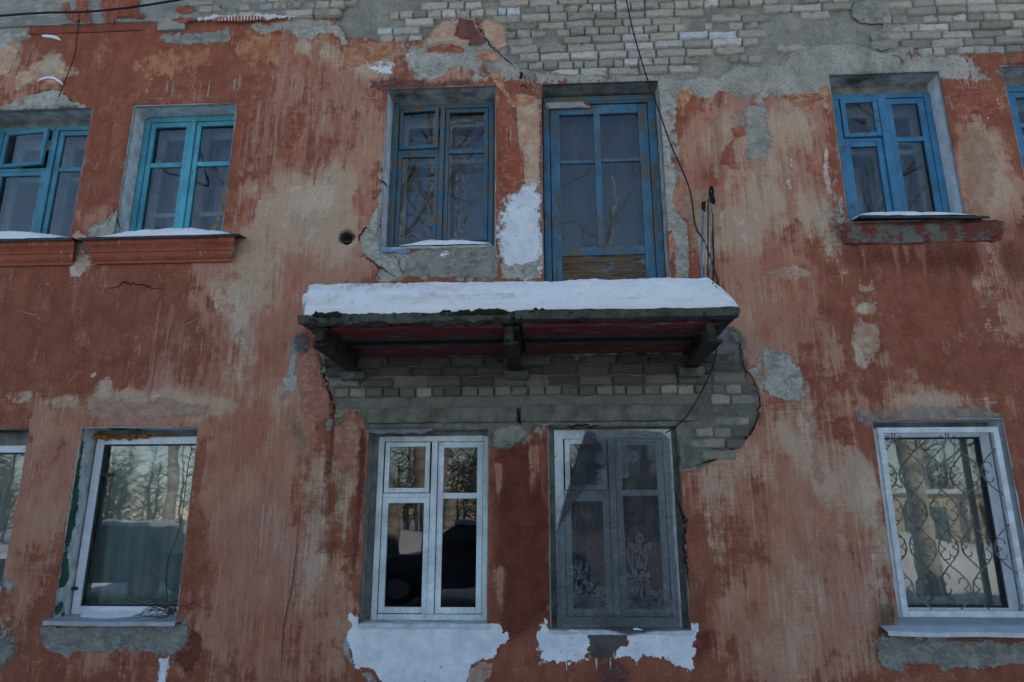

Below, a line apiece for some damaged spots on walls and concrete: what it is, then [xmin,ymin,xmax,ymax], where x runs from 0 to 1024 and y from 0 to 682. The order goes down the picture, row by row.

spalling [870,0,1024,57]
spalling [159,0,851,281]
crack [108,281,160,289]
spalling [320,353,768,469]
peeling [347,613,509,682]
peeling [536,618,699,672]